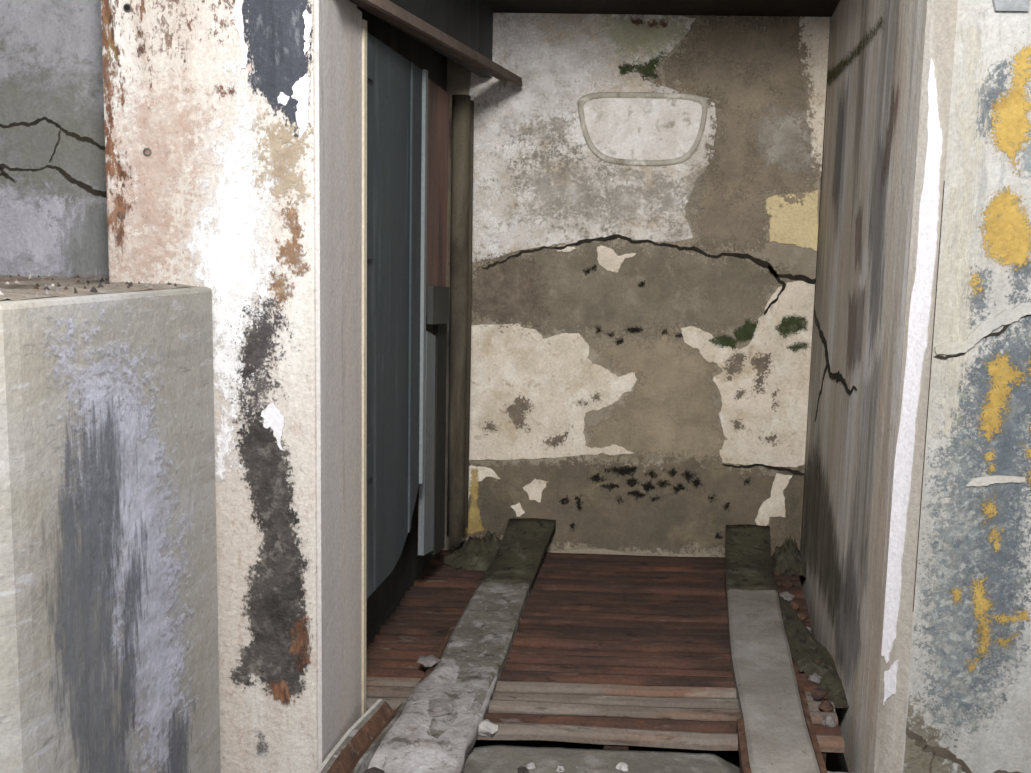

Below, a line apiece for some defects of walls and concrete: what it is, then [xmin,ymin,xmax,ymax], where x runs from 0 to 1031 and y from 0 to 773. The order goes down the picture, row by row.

crack [0,117,107,198]
leakage [51,319,197,773]
rust [101,0,235,254]
rust [268,680,295,705]
rust [290,614,313,672]
peeling [468,13,717,501]
leakage [468,14,861,687]
crack [482,90,857,422]
peeling [680,281,815,526]
leakage [868,133,886,359]
peeling [881,58,943,705]
crack [913,181,1031,611]